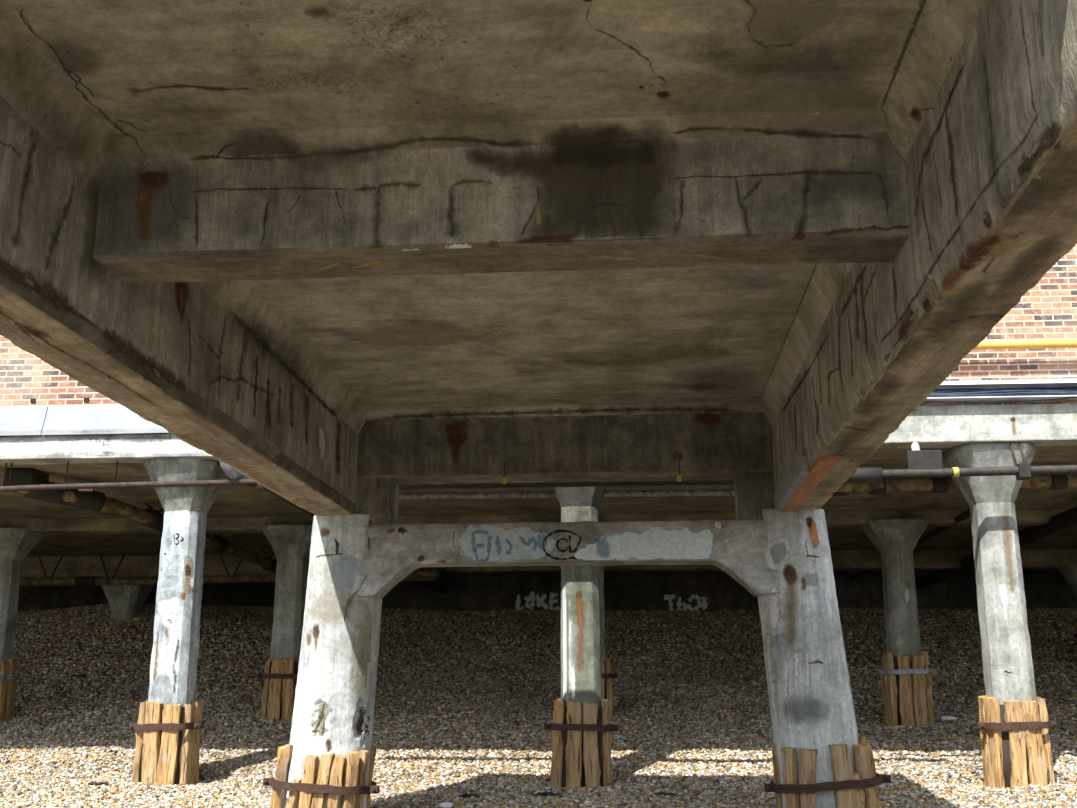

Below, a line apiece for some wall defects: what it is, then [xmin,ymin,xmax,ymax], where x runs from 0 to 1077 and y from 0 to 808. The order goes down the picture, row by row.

crack [19,9,144,143]
crack [0,142,91,323]
corrosion [138,172,169,239]
crack [170,183,420,248]
crack [196,137,523,160]
crack [448,181,491,236]
leakage [471,128,663,238]
crack [675,0,1043,450]
crack [188,313,340,473]
corrosion [446,423,467,462]
corrosion [783,565,806,639]
spalling [311,701,329,737]